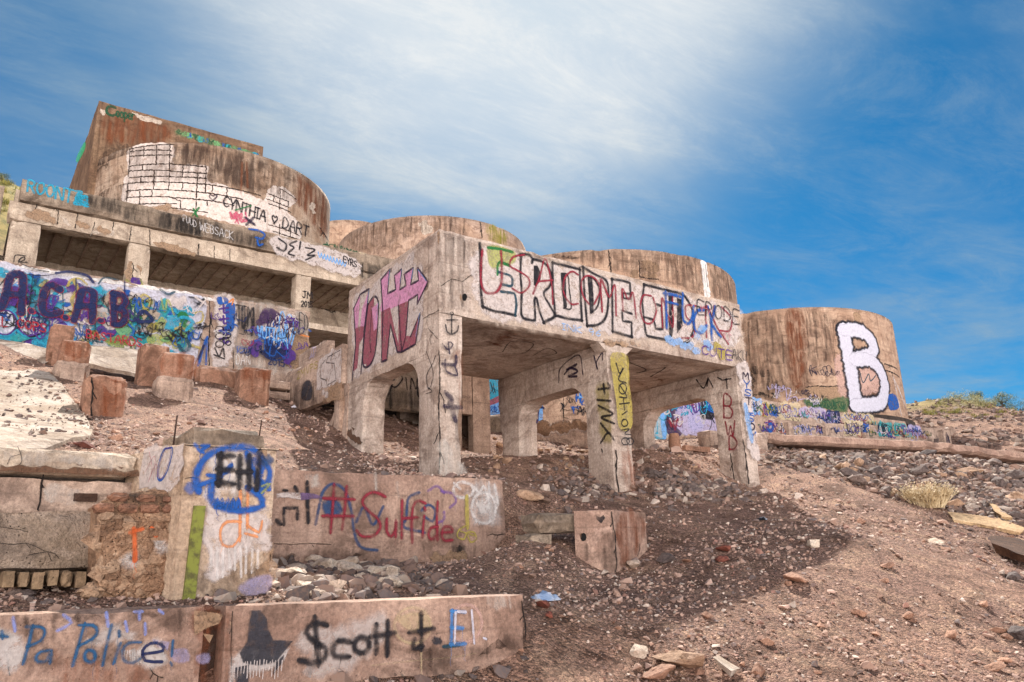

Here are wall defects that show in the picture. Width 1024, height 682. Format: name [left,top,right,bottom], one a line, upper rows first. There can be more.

crack [0,446,59,561]
spalling [100,516,168,598]
crack [610,450,640,572]